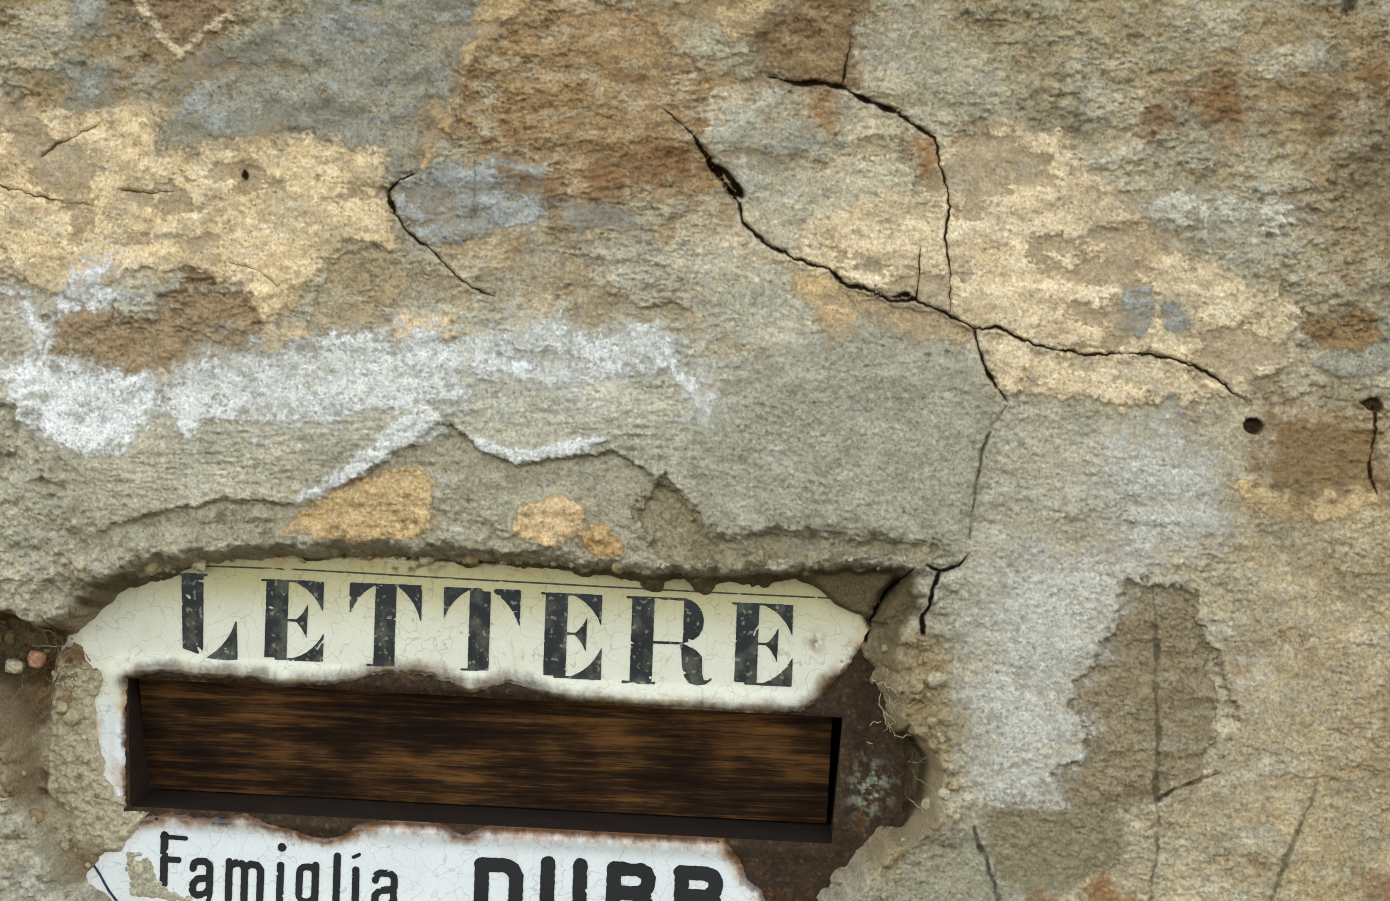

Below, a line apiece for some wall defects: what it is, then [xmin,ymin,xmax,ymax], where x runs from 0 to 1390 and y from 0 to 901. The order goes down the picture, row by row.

damp [0,252,722,507]
peeling [0,0,871,379]
crack [387,173,494,296]
flaking render [86,424,941,578]
crack [664,38,1249,642]
crack [1368,410,1378,494]